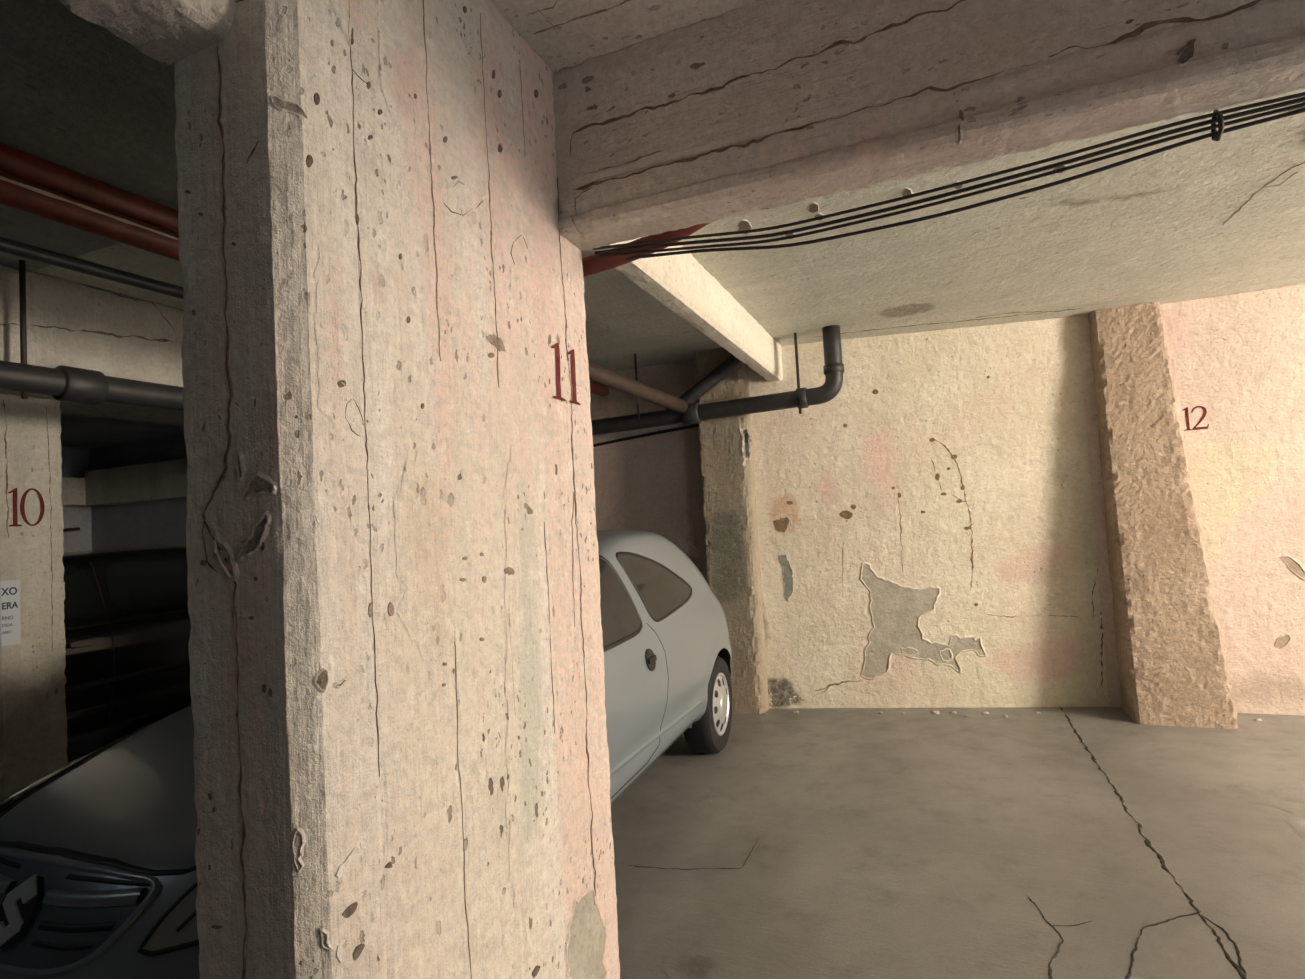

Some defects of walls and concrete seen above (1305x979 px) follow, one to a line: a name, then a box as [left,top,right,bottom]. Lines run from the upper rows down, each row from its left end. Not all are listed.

crack [519,0,631,146]
crack [423,0,528,386]
crack [1223,162,1305,225]
crack [202,46,258,979]
crack [544,0,1262,896]
peeling [859,562,987,680]
spalling [935,454,965,503]
peeling [1280,555,1305,581]
crack [454,642,472,979]
crack [1060,708,1246,979]
crack [1028,896,1091,979]